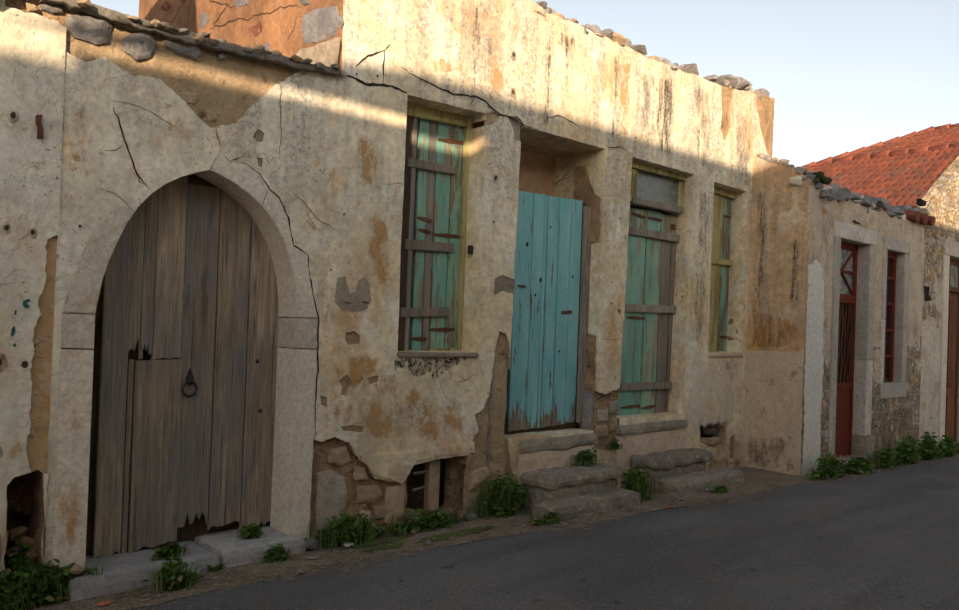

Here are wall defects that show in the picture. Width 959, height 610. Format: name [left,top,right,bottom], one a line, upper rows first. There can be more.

crack [104,101,186,188]
flaking render [5,0,298,128]
crack [276,83,284,160]
crack [347,44,581,130]
crack [215,124,339,434]
flaking render [494,275,515,295]
flaking render [4,229,57,574]
spalling [309,331,511,541]